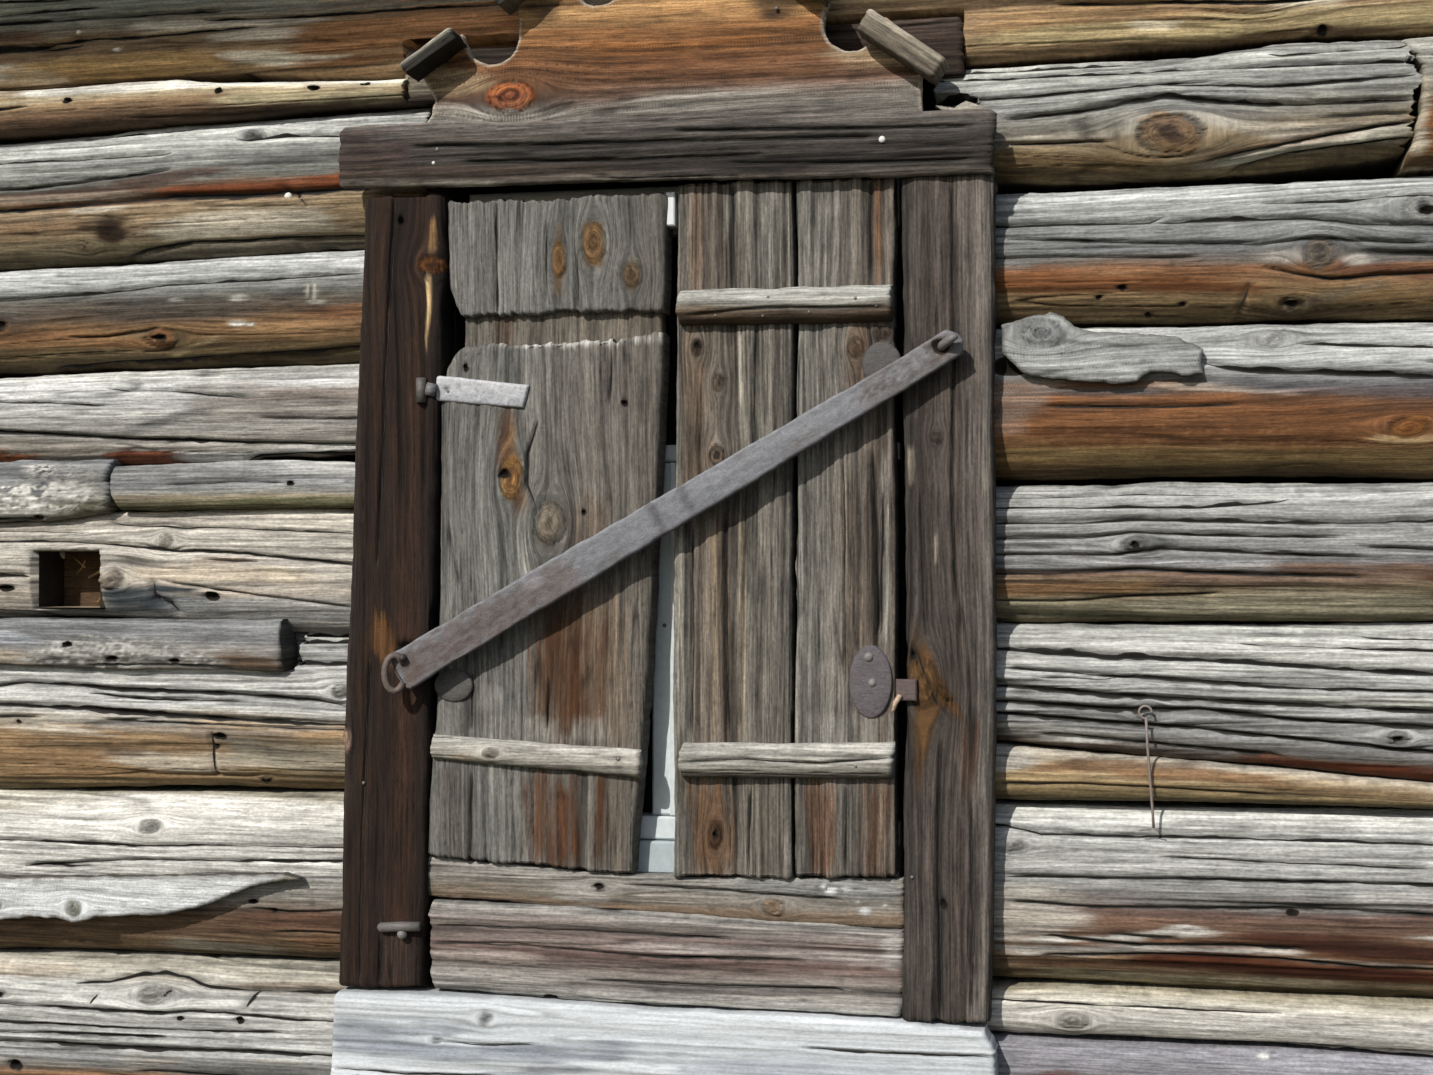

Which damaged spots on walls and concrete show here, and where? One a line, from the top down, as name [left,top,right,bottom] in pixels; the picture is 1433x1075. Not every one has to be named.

crack [411,45,1433,603]
crack [843,450,884,682]
crack [468,677,476,728]
crack [544,681,552,728]
crack [626,514,888,900]
crack [467,774,475,856]
crack [913,636,1433,1040]
crack [250,908,342,933]
crack [437,925,841,989]
crack [813,1048,990,1058]
crack [1305,1043,1427,1051]